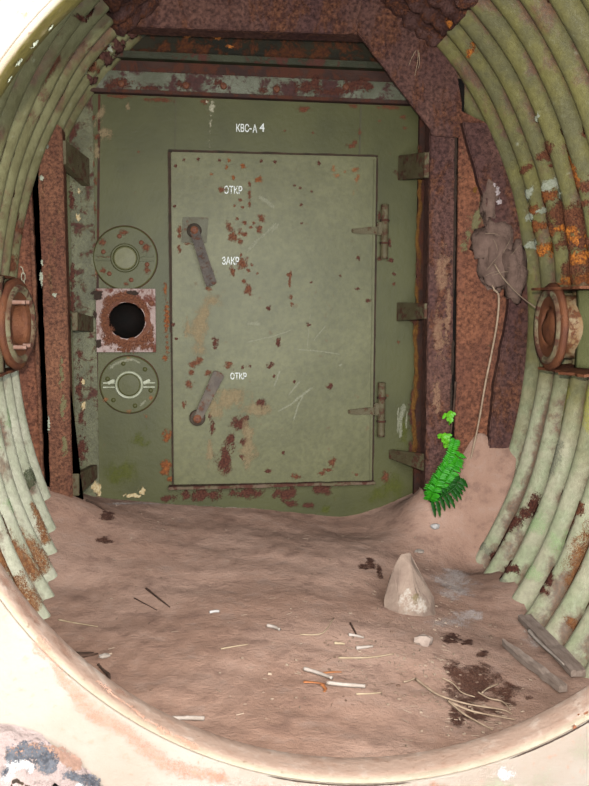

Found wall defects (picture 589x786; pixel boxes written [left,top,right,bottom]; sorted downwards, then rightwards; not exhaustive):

corrosion [87,33,176,103]
corrosion [519,139,554,175]
corrosion [528,129,589,287]
corrosion [226,214,267,297]
corrosion [98,282,155,359]
corrosion [431,243,452,415]
corrosion [213,415,250,477]
corrosion [161,474,332,508]
corrosion [499,560,521,579]
corrosion [489,491,542,561]
corrosion [539,500,589,596]
corrosion [563,615,582,631]